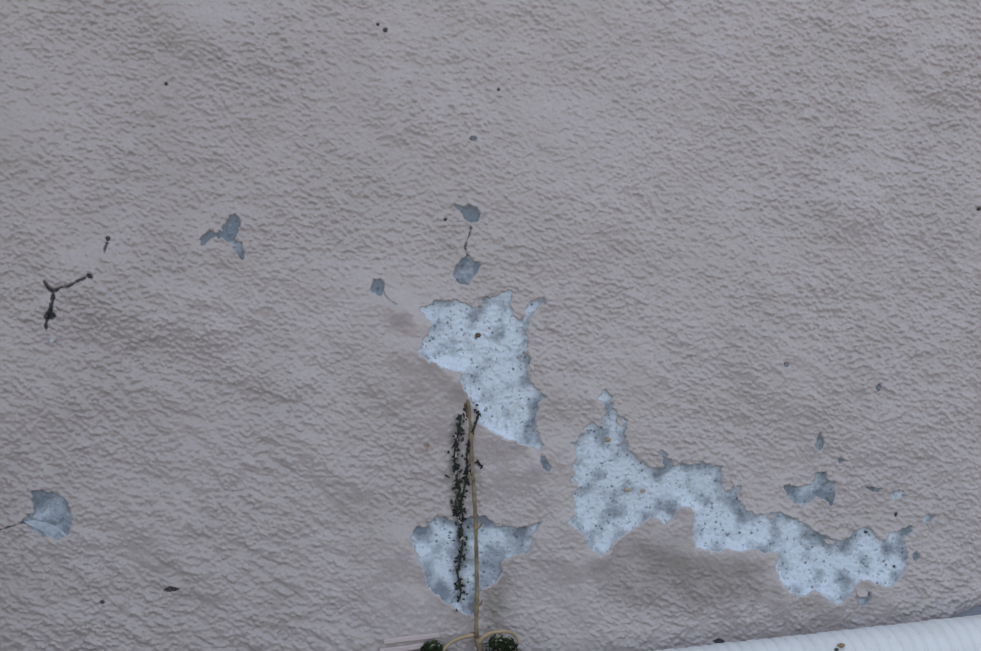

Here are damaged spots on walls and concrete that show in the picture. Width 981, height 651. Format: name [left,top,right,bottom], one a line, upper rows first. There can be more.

crack [44,274,92,343]
peeling [335,185,937,651]